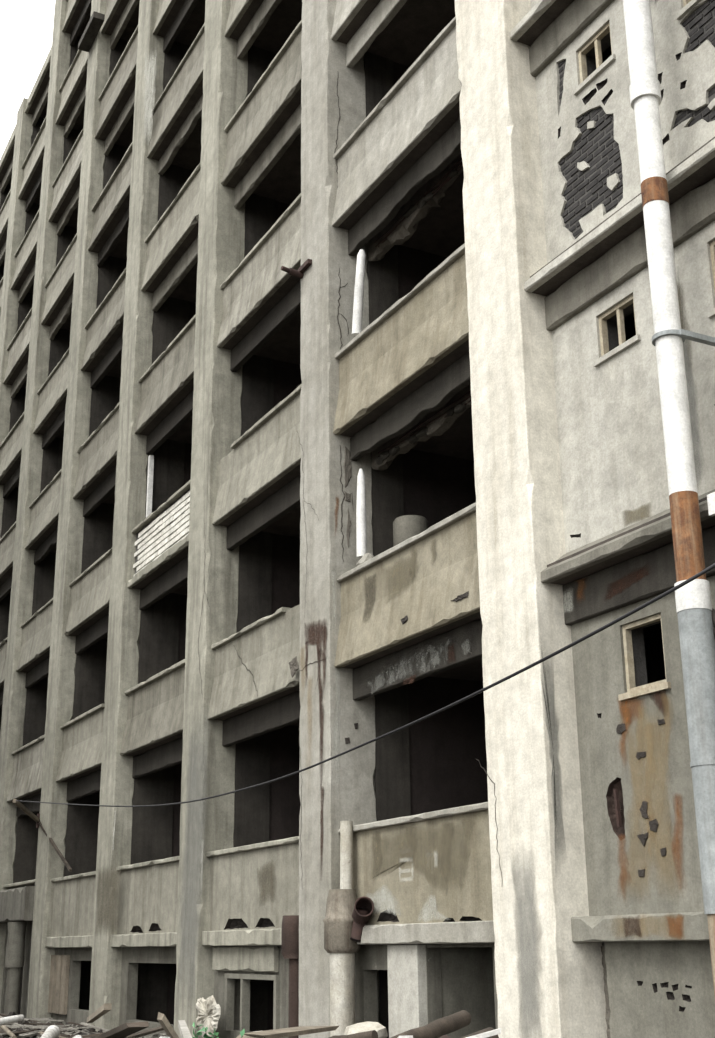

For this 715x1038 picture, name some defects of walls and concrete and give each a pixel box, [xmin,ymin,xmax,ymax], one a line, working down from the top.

flaking render [675,0,715,60]
flaking render [662,87,715,145]
flaking render [559,79,623,239]
crack [337,268,349,350]
crack [296,427,354,617]
peeling [368,638,470,690]
corrosion [305,621,327,865]
corrosion [619,698,641,753]
corrosion [650,690,668,714]
spalling [606,777,659,847]
spalling [637,981,692,1012]